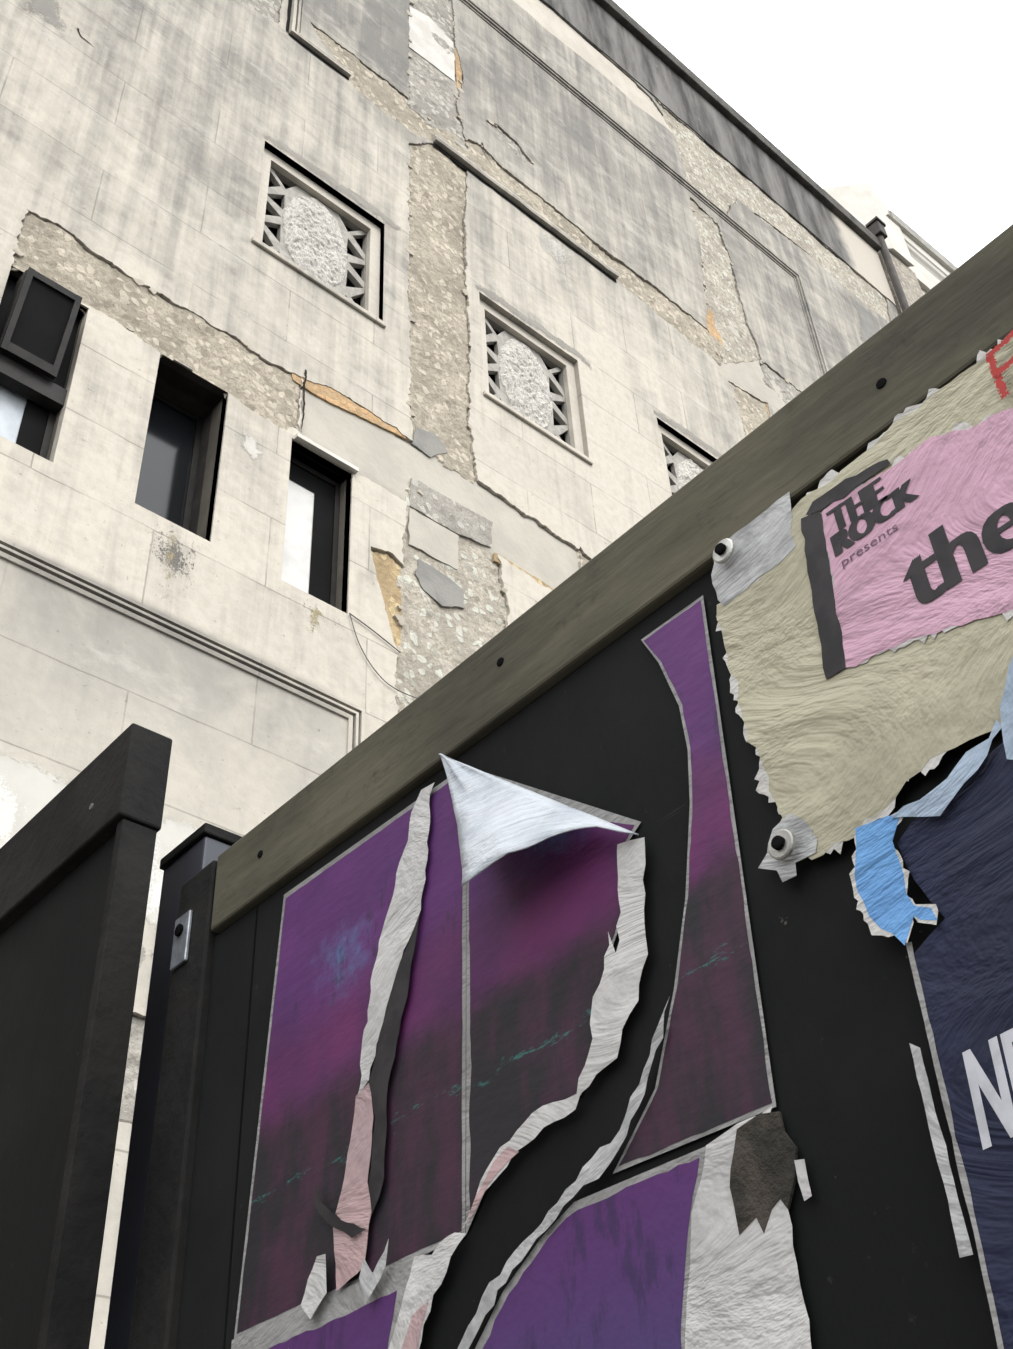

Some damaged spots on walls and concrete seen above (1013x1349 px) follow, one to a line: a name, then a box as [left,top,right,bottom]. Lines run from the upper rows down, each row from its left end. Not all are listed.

spalling [239,0,282,23]
spalling [314,0,890,486]
spalling [10,212,300,430]
flaking render [371,550,406,650]
spalling [492,553,553,590]
spalling [119,1016,145,1124]